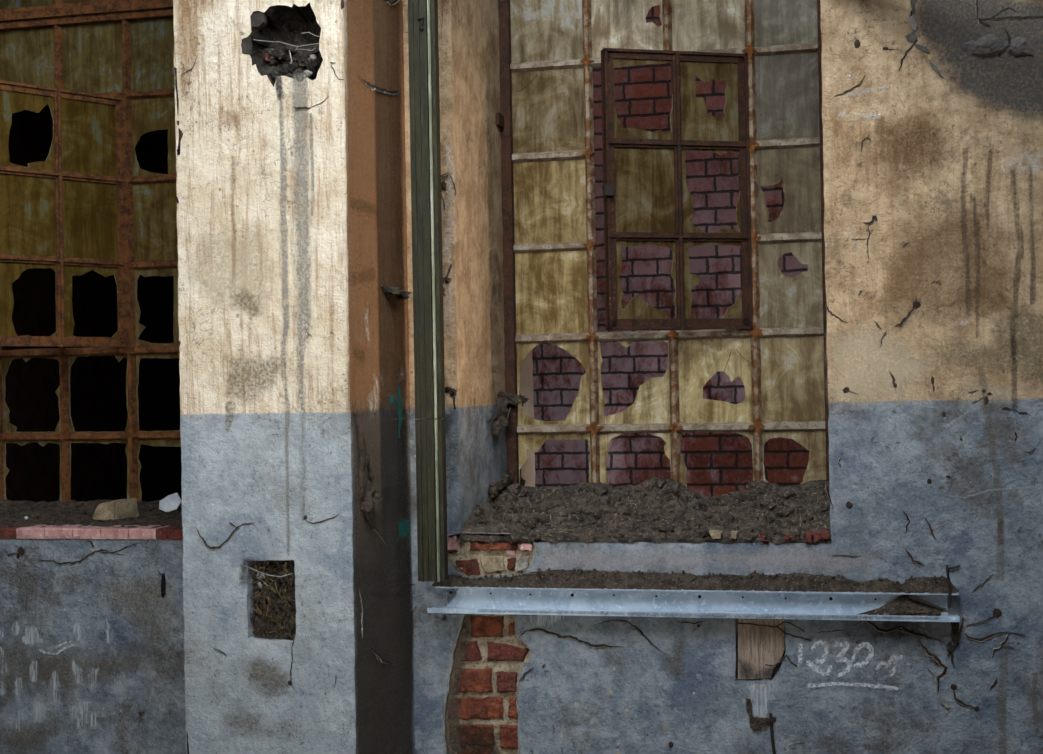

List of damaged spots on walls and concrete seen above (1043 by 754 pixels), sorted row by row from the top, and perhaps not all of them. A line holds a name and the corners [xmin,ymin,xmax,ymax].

hole [241,2,323,88]
damp [895,152,1035,314]
damp [226,75,314,552]
crack [8,540,137,568]
crack [195,522,252,550]
spalling [447,532,537,580]
flaking render [442,614,532,754]
crack [518,664,546,683]
crack [518,619,668,655]
crack [818,608,1023,711]